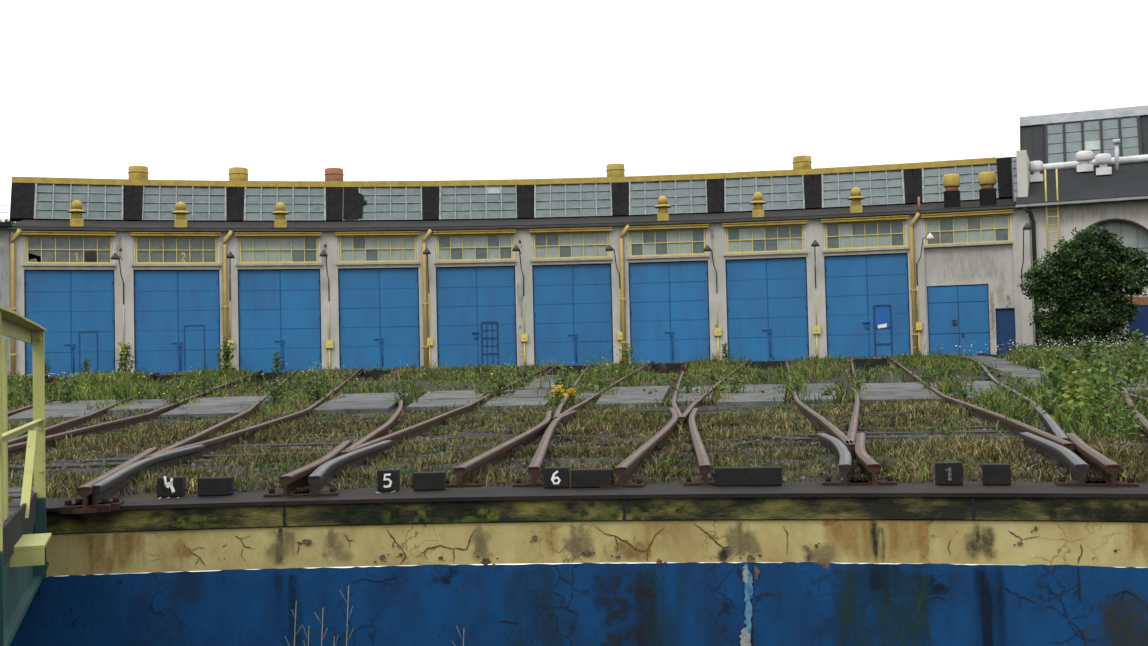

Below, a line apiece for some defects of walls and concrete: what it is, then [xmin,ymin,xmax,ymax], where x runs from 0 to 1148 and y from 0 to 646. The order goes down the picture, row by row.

leakage [268,528,294,562]
crack [350,528,476,588]
crack [595,526,665,562]
crack [696,525,754,646]
peeling [739,553,761,646]
leakage [975,572,1002,646]